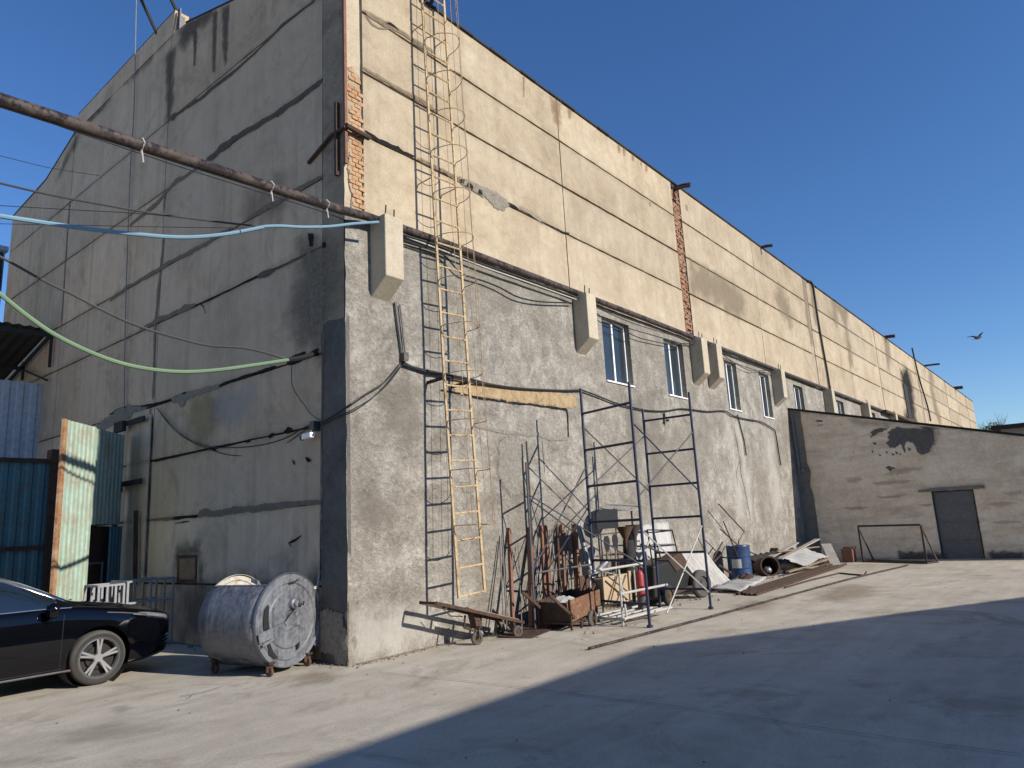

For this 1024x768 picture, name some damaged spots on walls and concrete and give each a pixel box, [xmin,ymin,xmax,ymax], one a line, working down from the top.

water stain [166,6,229,121]
spalling [460,176,510,211]
peeling [870,427,933,471]